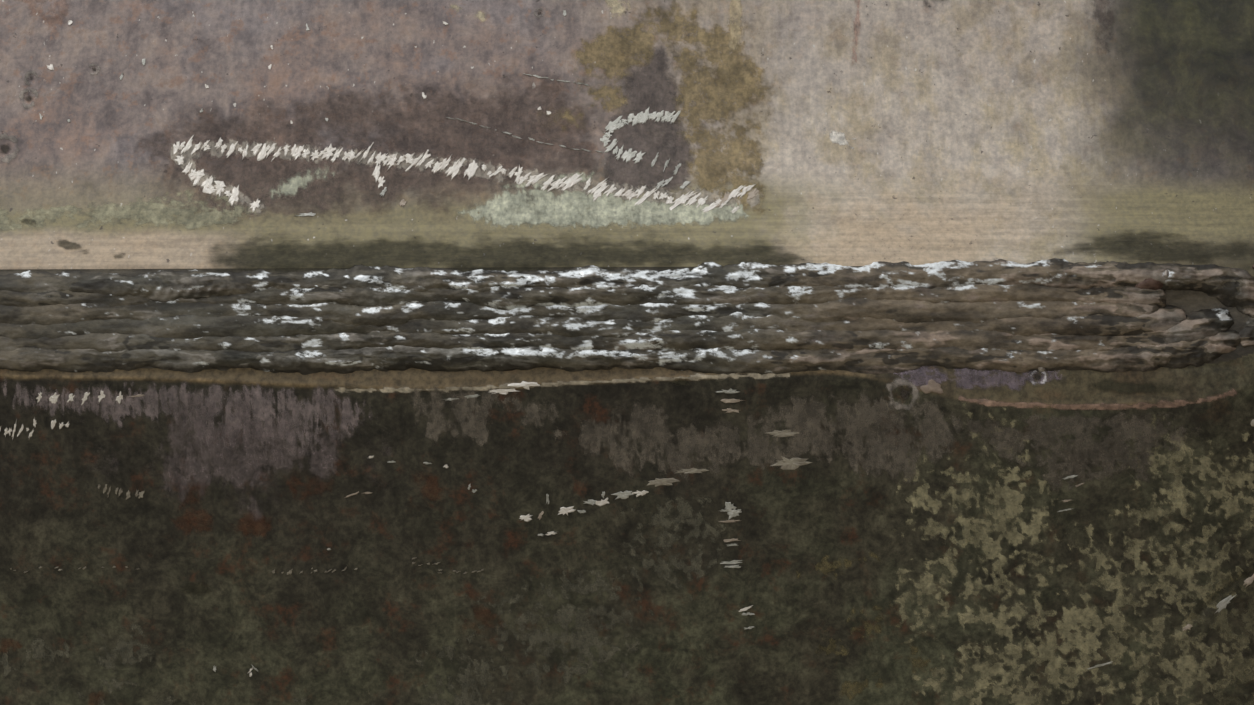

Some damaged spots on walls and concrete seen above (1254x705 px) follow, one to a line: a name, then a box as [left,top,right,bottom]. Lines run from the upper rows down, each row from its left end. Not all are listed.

water stain [142,47,693,219]
water stain [841,403,1254,705]